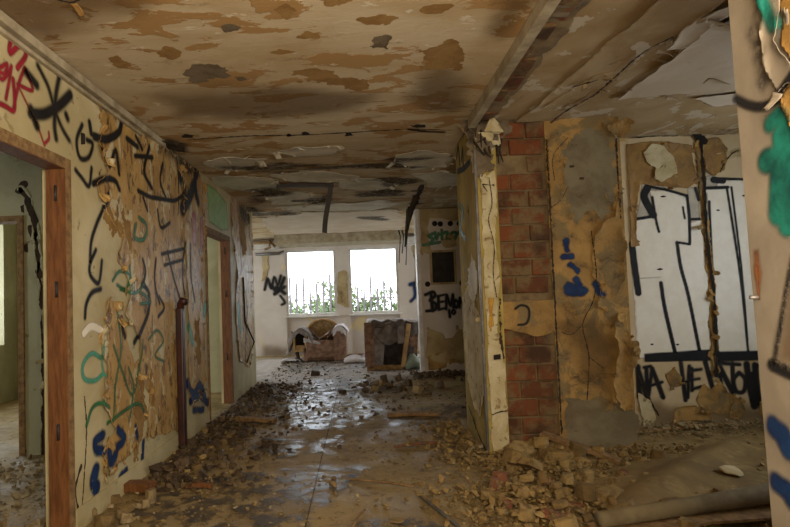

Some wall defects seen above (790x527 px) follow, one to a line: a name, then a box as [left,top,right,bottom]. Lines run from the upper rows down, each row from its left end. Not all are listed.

flaking render [144,46,182,60]
flaking render [183,64,248,83]
flaking render [221,24,241,33]
flaking render [291,68,370,91]
flaking render [356,14,399,25]
flaking render [370,35,392,49]
crack [15,180,45,455]
peeling [97,103,406,483]
flaking render [386,0,747,451]
crack [545,37,673,434]
crack [693,134,739,377]
crack [75,396,87,508]